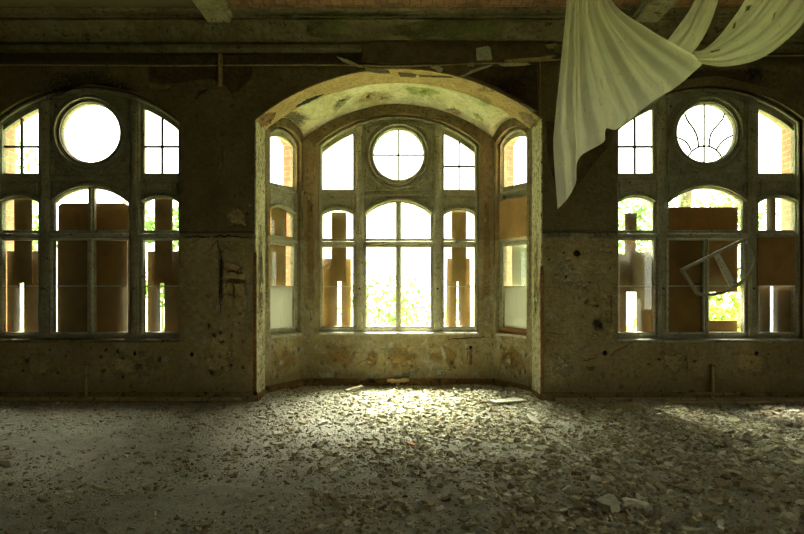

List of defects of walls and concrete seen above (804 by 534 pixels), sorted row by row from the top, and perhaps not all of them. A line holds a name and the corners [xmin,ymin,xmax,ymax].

spalling [336,43,557,112]